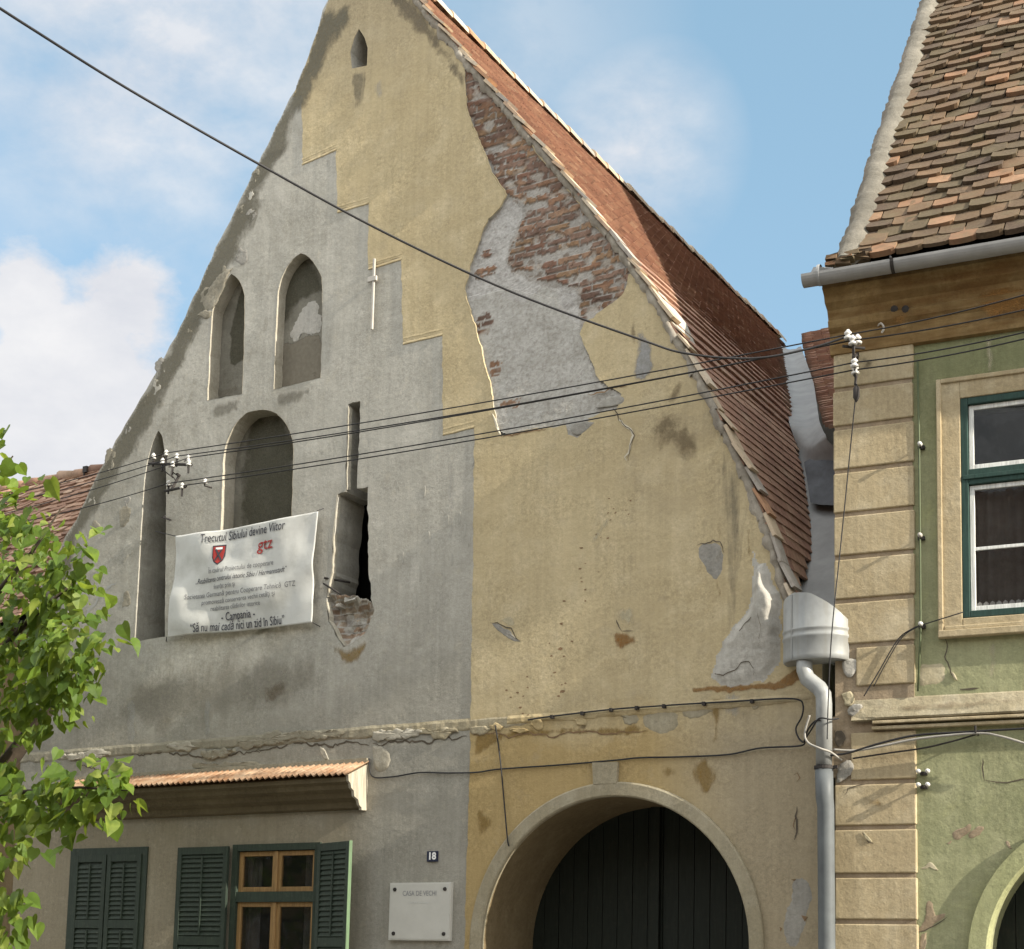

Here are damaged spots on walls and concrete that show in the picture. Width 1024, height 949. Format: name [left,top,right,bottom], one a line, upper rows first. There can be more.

spalling [463,70,630,438]
spalling [198,268,233,319]
flaking render [282,262,322,387]
crack [613,408,635,461]
peeling [698,540,724,579]
spalling [326,592,375,661]
spalling [493,617,520,642]
flaking render [132,676,713,771]
flaking render [63,748,111,771]